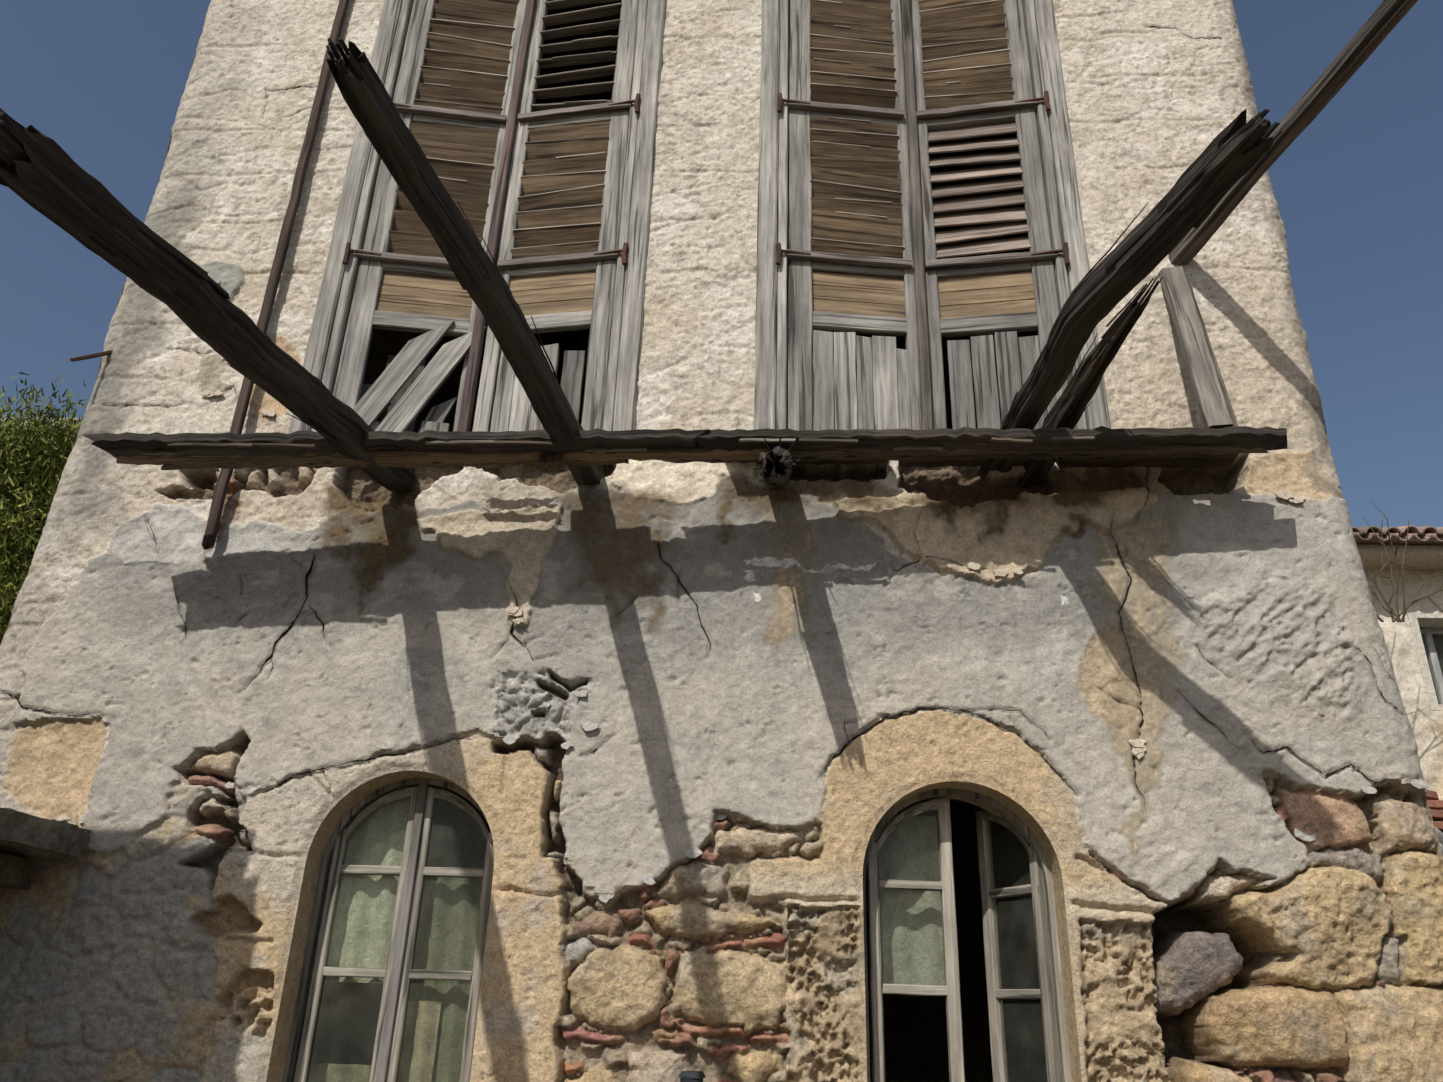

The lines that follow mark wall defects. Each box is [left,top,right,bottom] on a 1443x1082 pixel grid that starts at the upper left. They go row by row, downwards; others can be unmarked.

spalling [160,467,316,500]
crack [243,555,328,690]
crack [494,580,560,660]
crack [658,540,711,657]
crack [1100,467,1150,810]
peeling [4,716,107,828]
spalling [183,731,252,877]
crack [263,737,482,795]
crack [1178,691,1421,784]
spalling [197,896,262,936]
spalling [493,667,824,1082]
spalling [1095,777,1443,1082]